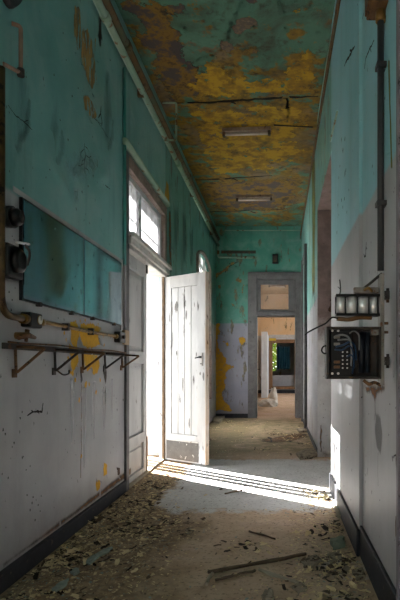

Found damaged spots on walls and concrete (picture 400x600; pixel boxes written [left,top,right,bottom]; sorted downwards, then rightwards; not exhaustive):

peeling [74,3,104,124]
peeling [120,0,324,179]
crack [176,96,318,108]
peeling [63,319,105,383]
peeling [216,321,234,412]